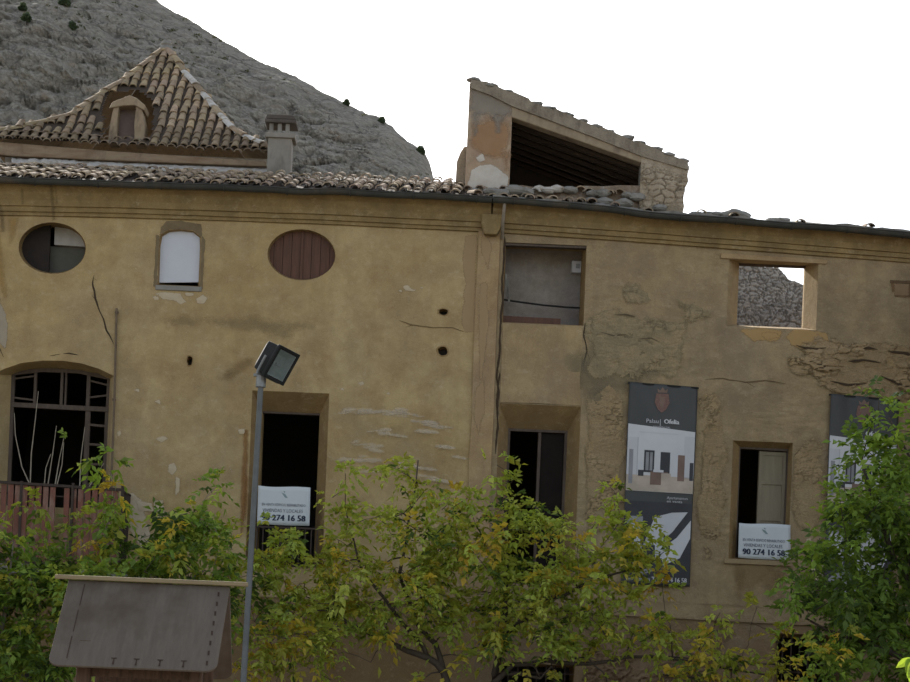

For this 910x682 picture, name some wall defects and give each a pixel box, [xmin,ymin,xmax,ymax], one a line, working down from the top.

spalling [153,221,207,304]
crack [92,276,114,344]